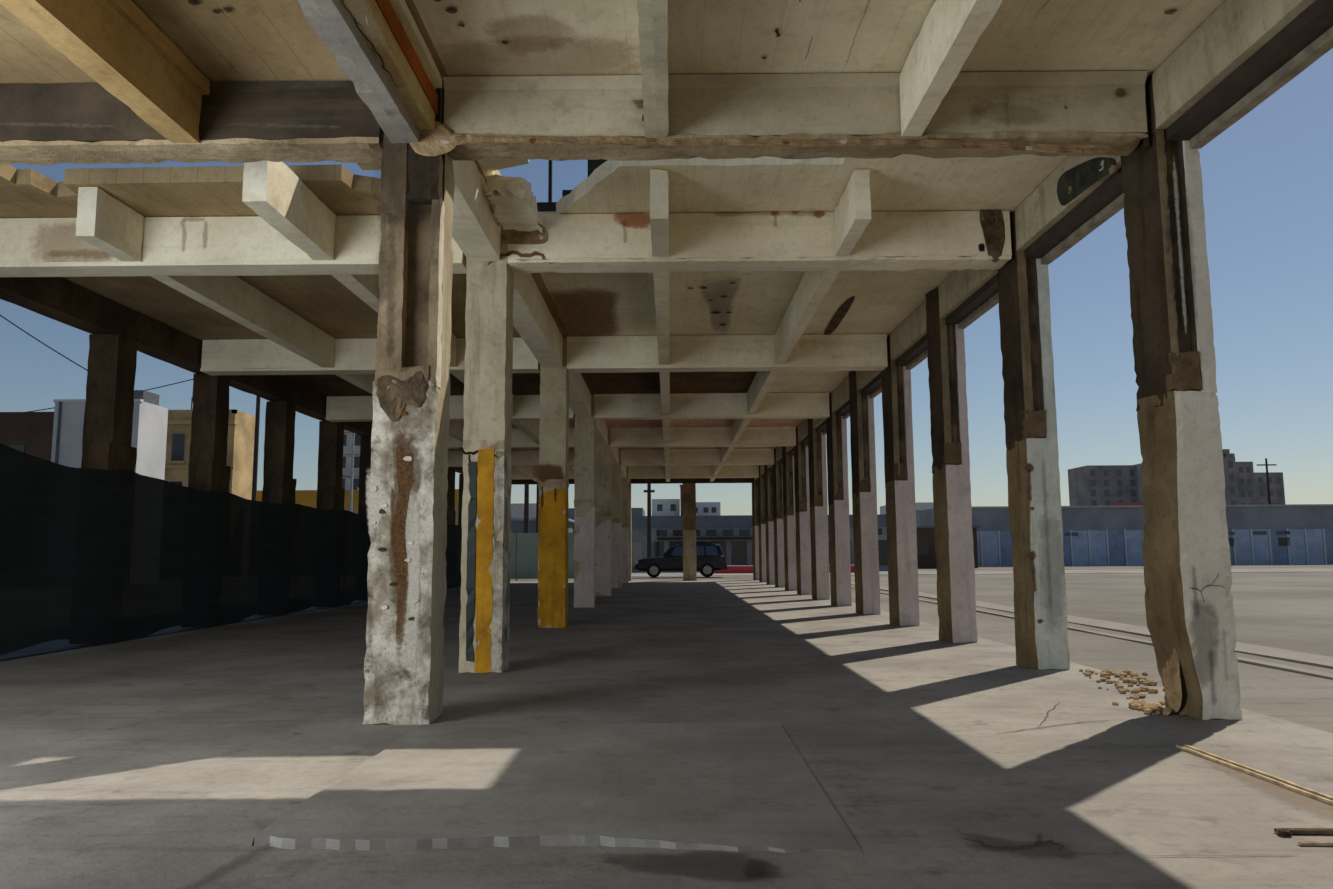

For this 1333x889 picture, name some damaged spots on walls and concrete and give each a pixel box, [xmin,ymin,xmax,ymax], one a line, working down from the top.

crack [775,28,813,59]